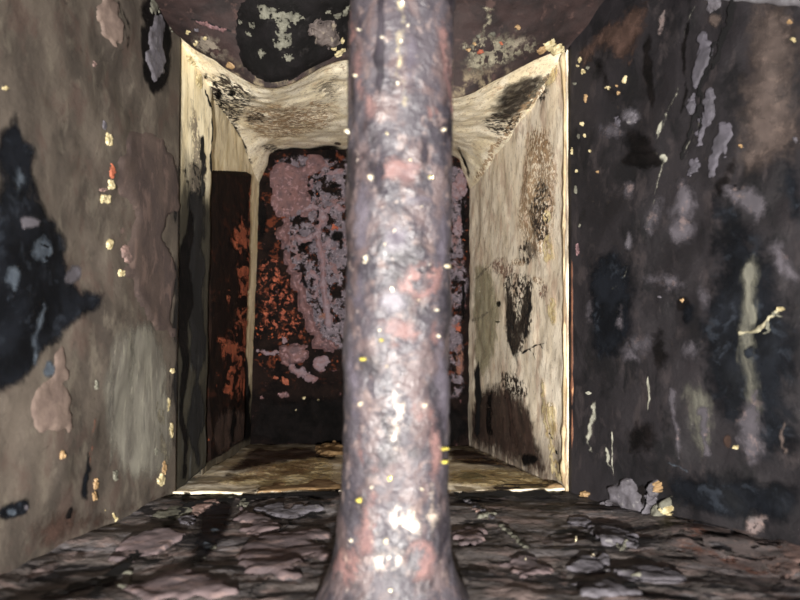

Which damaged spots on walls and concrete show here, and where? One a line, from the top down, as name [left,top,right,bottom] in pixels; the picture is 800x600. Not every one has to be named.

peeling [96,0,129,47]
peeling [141,0,173,94]
peeling [238,5,305,62]
rust [218,185,302,400]
rust [314,0,469,600]
damp [507,284,533,355]
peeling [289,355,330,384]
damp [474,363,493,436]
damp [585,391,596,450]
damp [668,388,680,453]
damp [724,262,765,463]
peeling [642,480,673,516]